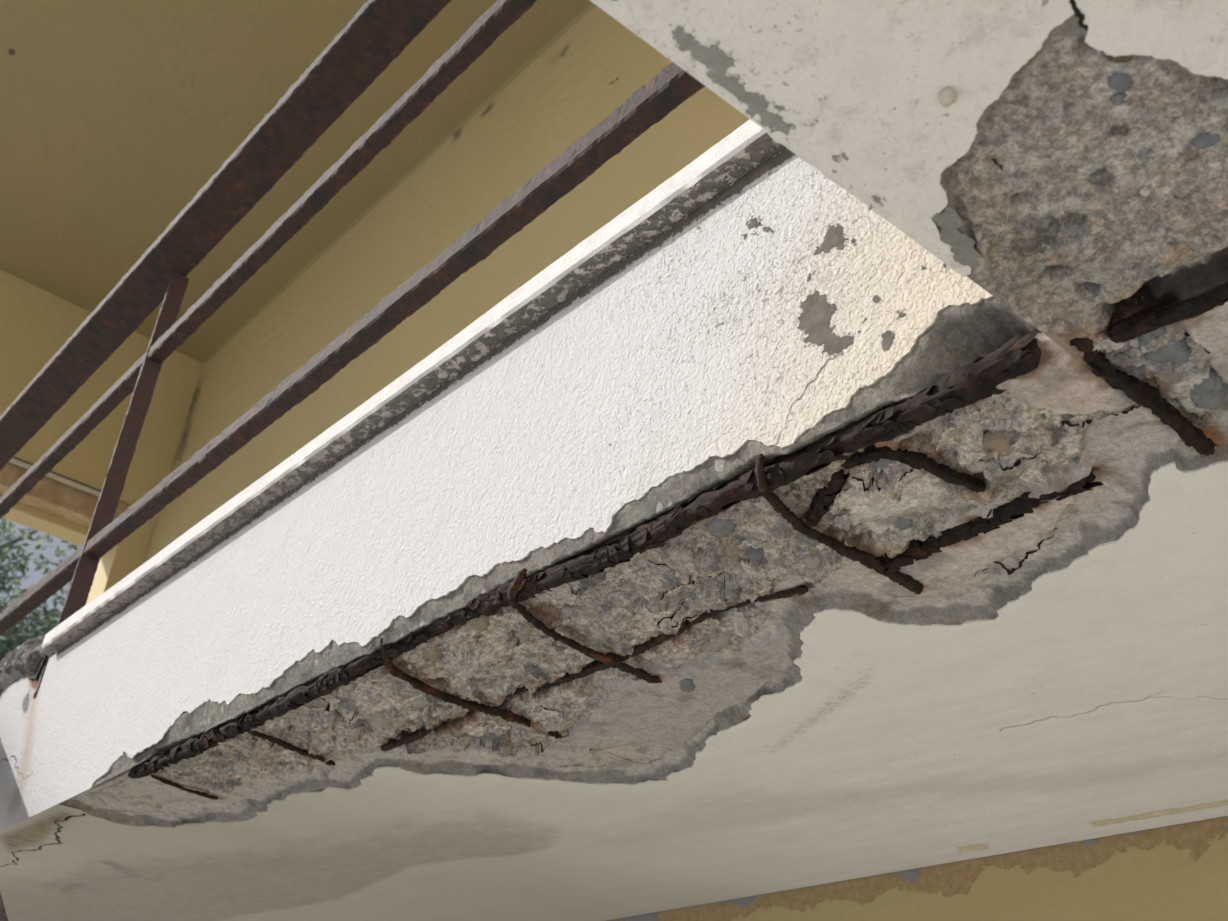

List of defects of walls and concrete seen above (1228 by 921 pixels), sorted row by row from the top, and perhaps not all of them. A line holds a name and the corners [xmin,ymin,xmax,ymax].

crack [1069,0,1088,31]
peeling [812,220,857,255]
spalling [932,13,1228,462]
peeling [0,26,818,695]
peeling [797,273,867,358]
spalling [59,297,1220,827]
crack [0,814,86,867]
peeling [607,816,1228,921]